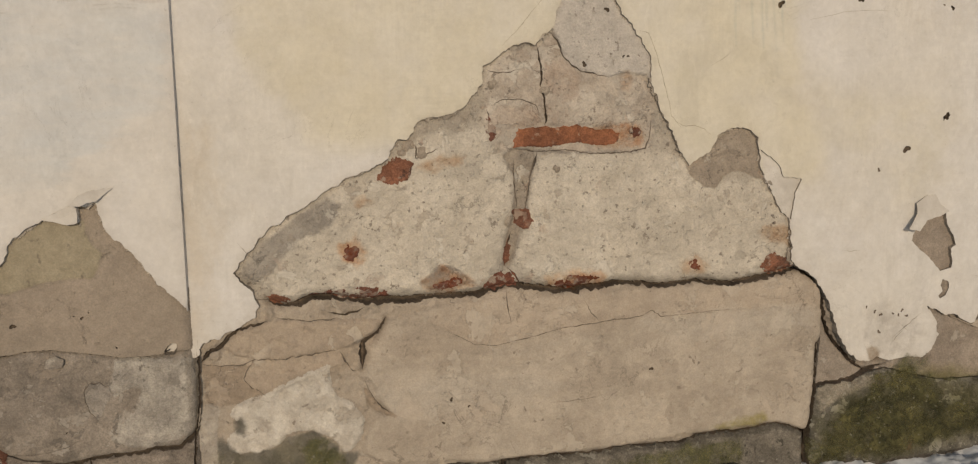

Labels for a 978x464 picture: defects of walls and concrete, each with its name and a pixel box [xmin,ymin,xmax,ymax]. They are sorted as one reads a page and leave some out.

flaking render [235,0,800,304]
crack [7,267,880,464]
flaking render [0,188,978,464]